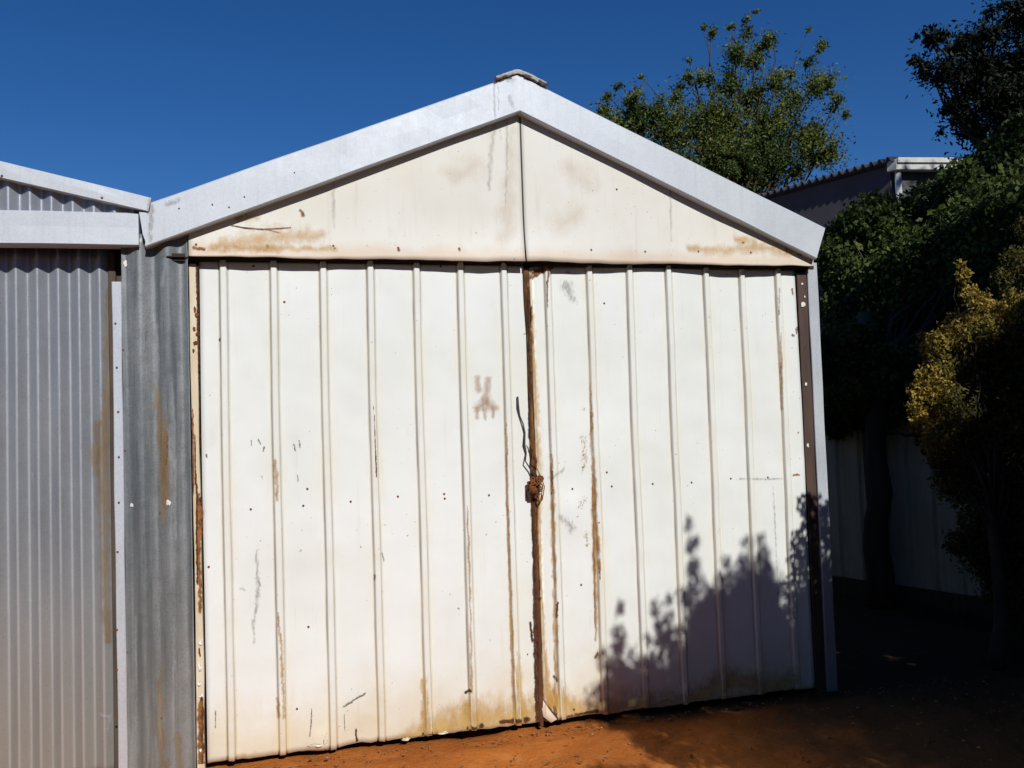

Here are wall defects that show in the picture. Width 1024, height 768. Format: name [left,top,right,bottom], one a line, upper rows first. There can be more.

corrosion [157,392,168,524]
corrosion [192,246,205,613]
corrosion [499,265,601,724]
corrosion [197,697,205,764]